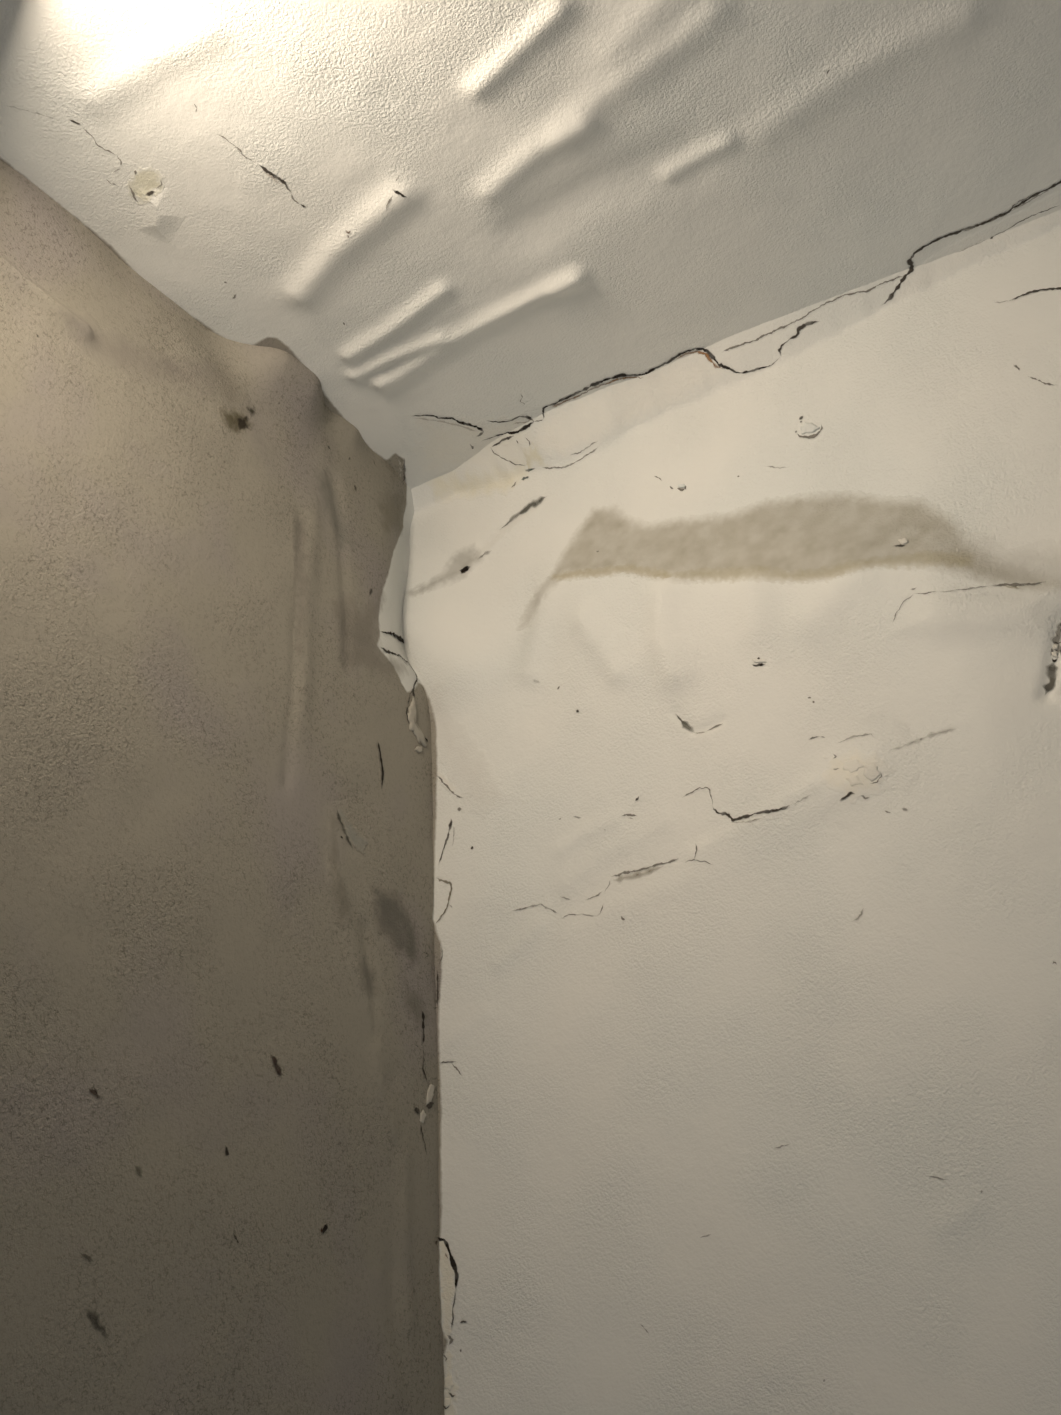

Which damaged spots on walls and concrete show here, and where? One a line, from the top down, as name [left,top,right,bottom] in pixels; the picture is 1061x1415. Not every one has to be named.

crack [70,120,122,185]
crack [221,136,305,207]
crack [415,181,1061,487]
water stain [514,490,1061,631]
crack [686,787,789,821]
crack [516,845,710,917]
peeling [439,1239,461,1415]